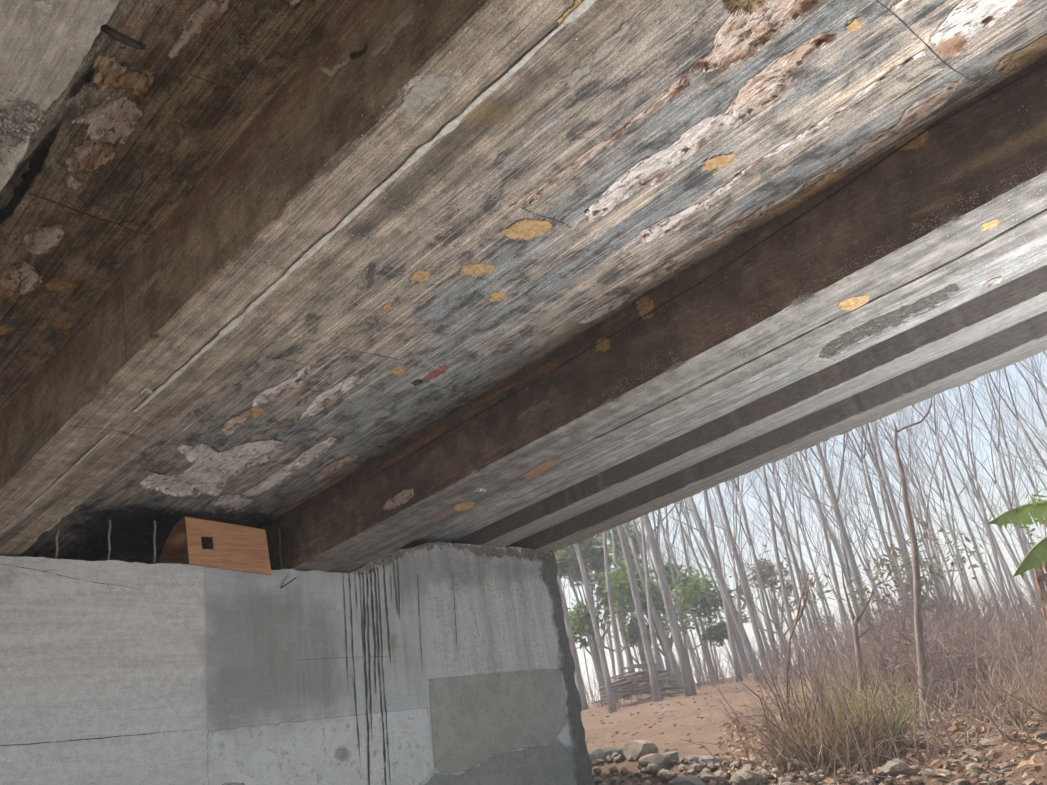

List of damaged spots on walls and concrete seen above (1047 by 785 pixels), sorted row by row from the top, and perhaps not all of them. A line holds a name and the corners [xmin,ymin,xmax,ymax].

spalling [58,55,154,190]
spalling [522,0,836,221]
spalling [637,0,1032,242]
crack [876,0,982,85]
spalling [993,35,1047,73]
spalling [0,223,64,305]
crack [9,171,150,235]
spalling [139,365,364,513]
spalling [382,489,415,511]
water stain [343,558,400,785]
water stain [422,551,594,785]